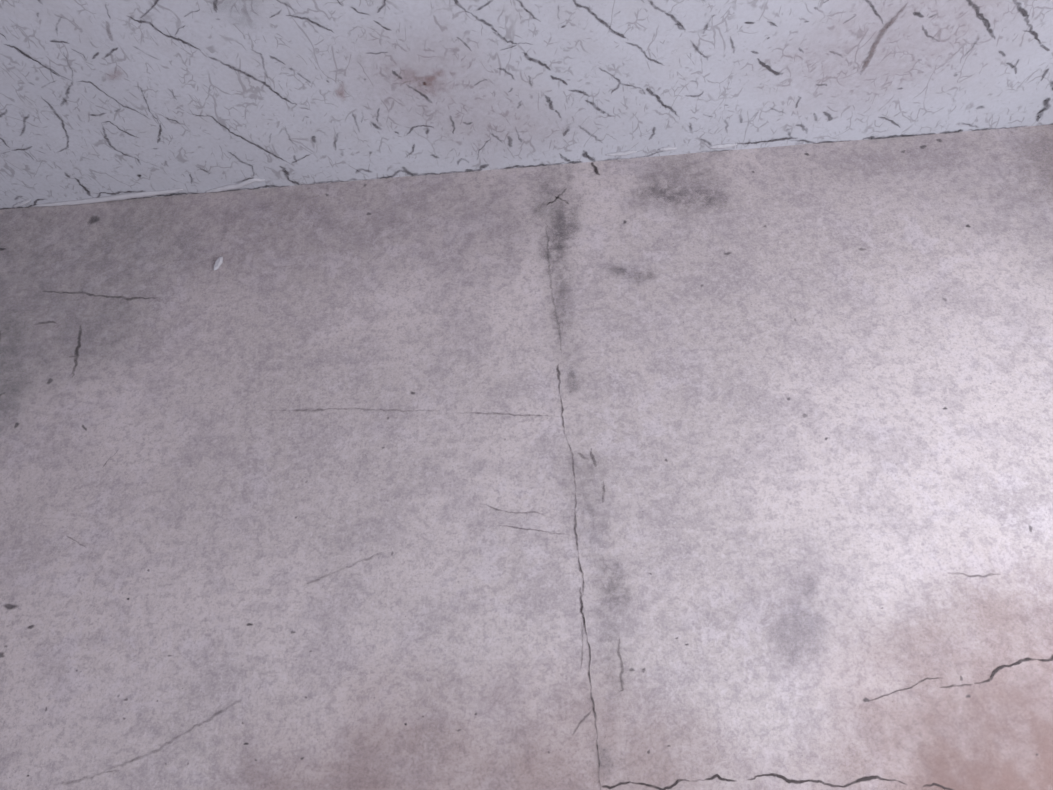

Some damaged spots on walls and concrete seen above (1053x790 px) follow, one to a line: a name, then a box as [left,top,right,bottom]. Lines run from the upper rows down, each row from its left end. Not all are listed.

crack [967,0,992,33]
crack [132,0,294,104]
crack [454,0,701,153]
crack [731,22,780,75]
crack [1018,3,1053,121]
crack [0,33,315,199]
crack [467,130,600,175]
crack [745,112,842,144]
crack [868,117,1007,139]
crack [574,523,682,790]
crack [983,656,1053,683]
crack [708,773,903,787]